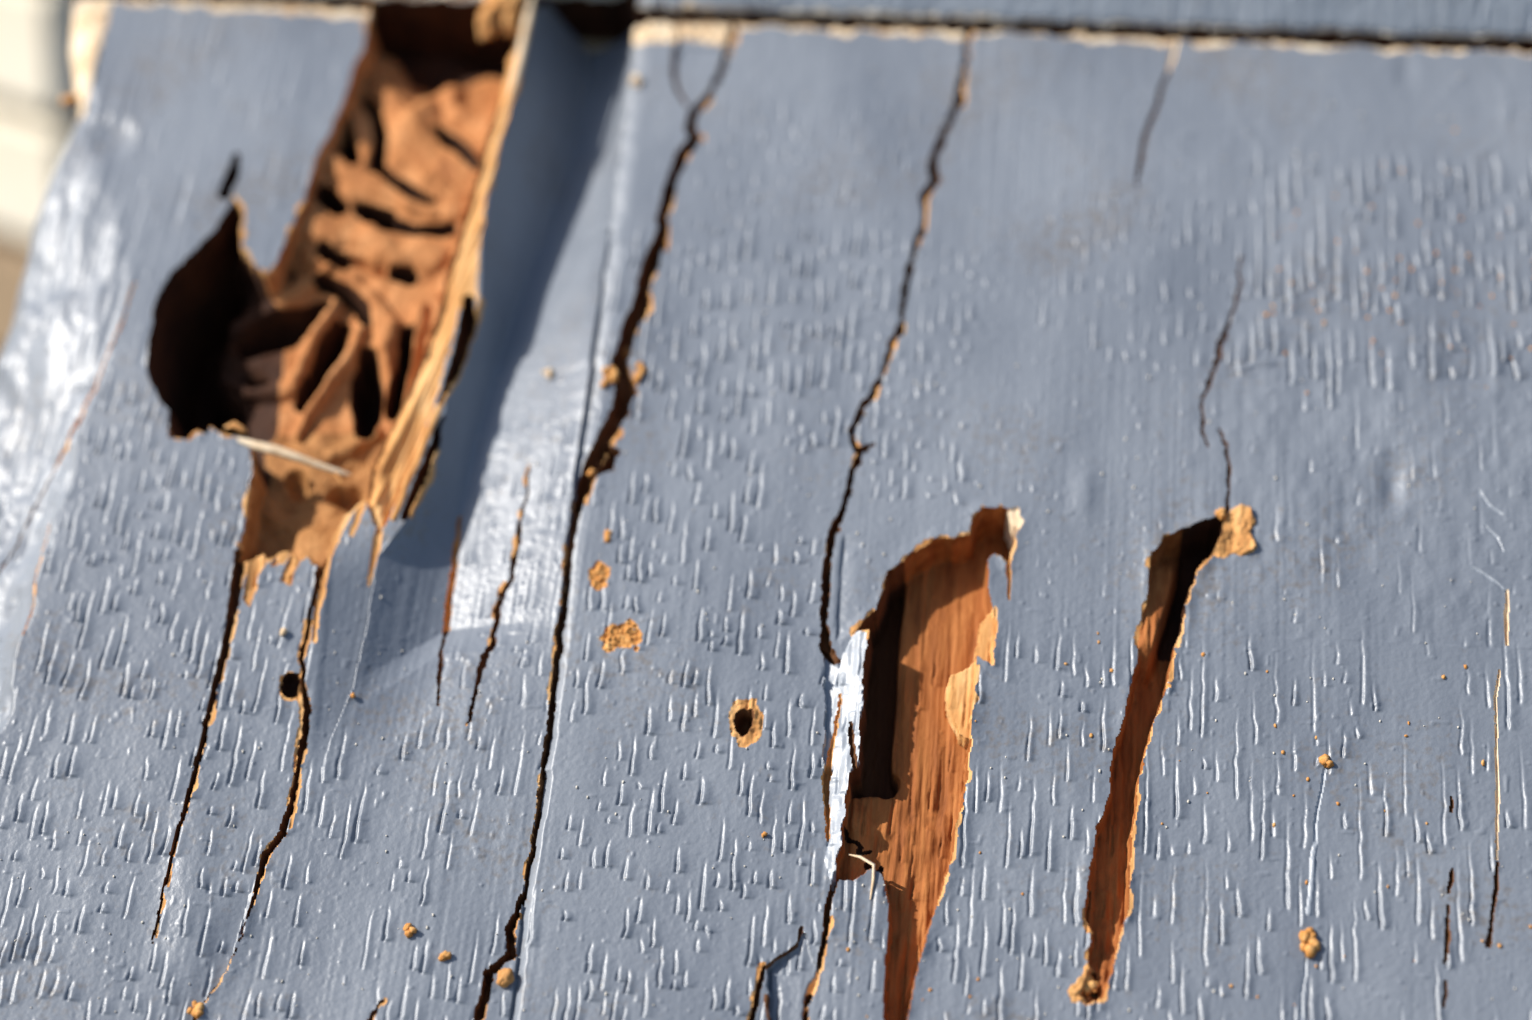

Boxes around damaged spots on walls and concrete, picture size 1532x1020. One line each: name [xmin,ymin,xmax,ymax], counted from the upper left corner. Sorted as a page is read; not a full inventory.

crack [1135,40,1178,186]
crack [151,547,248,944]
crack [193,567,324,1020]
spalling [146,0,535,643]
crack [436,465,532,726]
crack [473,25,739,1020]
crack [746,826,884,1020]
peeling [818,631,868,891]
crack [819,31,974,655]
crack [1199,255,1242,515]